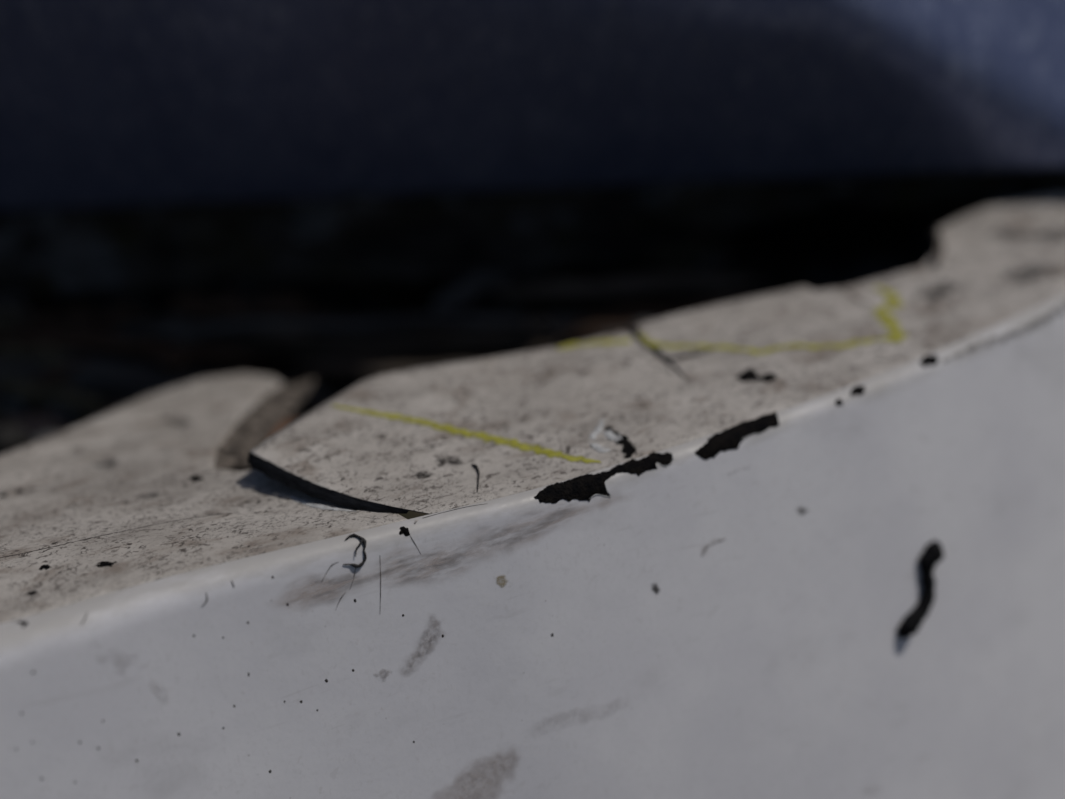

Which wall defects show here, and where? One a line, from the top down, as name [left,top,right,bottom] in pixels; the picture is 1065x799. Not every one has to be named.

peeling [737,368,778,383]
peeling [835,386,865,406]
peeling [919,355,939,367]
spalling [215,379,315,469]
peeling [695,411,779,460]
crack [247,451,488,518]
peeling [534,419,674,504]